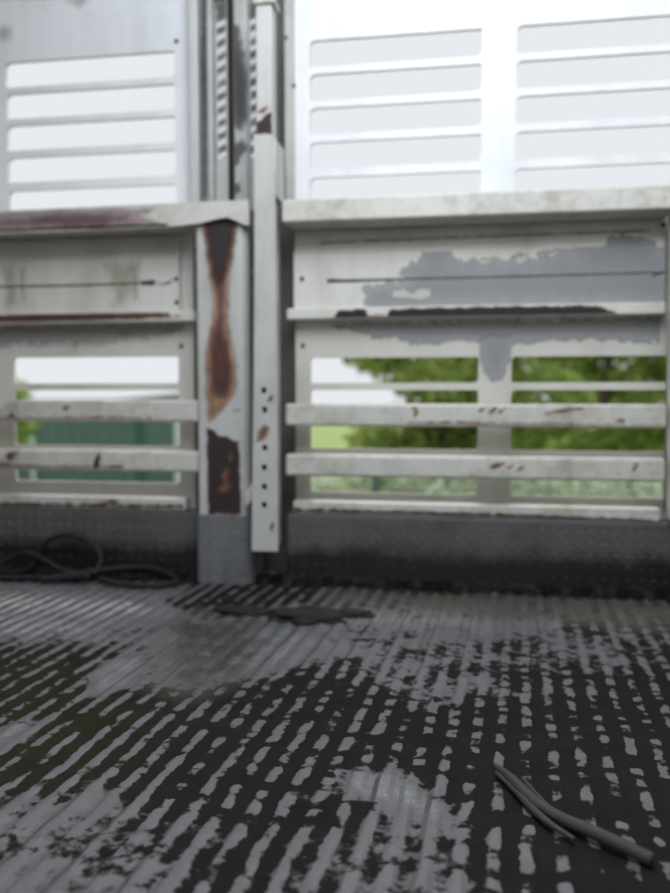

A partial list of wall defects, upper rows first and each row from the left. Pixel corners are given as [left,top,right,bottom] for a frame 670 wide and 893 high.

rust [0,209,167,232]
peeling [362,234,665,307]
rust [0,312,180,322]
rust [203,219,241,515]
peeling [332,317,661,381]